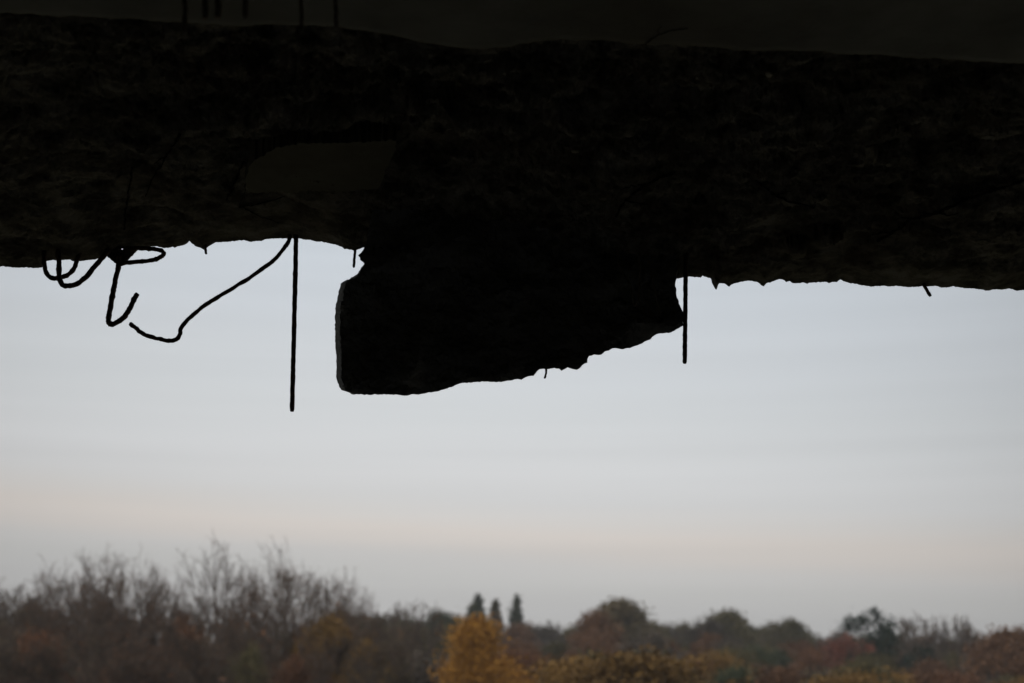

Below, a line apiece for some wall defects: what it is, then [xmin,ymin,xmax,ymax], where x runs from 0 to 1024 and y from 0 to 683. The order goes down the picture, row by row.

spalling [0,0,1024,412]